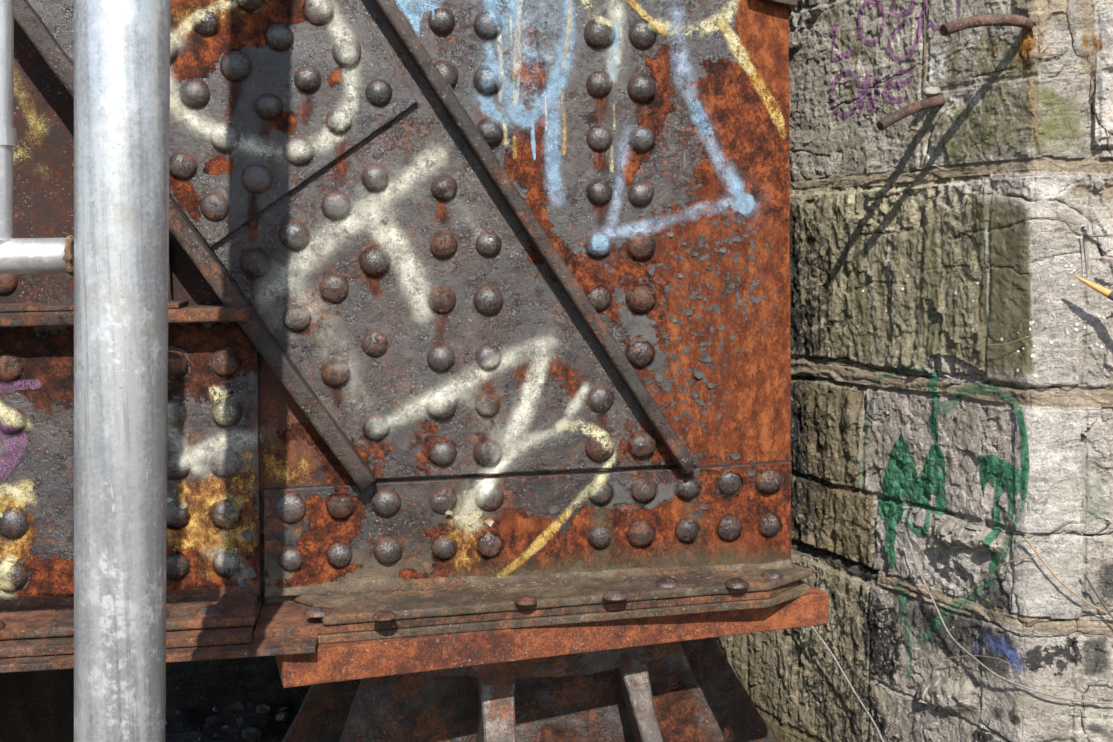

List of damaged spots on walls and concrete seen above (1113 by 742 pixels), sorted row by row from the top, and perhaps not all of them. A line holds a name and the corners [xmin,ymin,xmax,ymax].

rust [398,0,791,579]
peeling [604,177,780,444]
leakage [790,203,836,357]
leakage [855,230,952,361]
leakage [972,204,1037,378]
leakage [1063,205,1113,371]
rust [0,487,74,599]
rust [652,679,732,742]
leakage [791,369,877,577]
leakage [788,575,1110,742]
leakage [1100,558,1113,598]